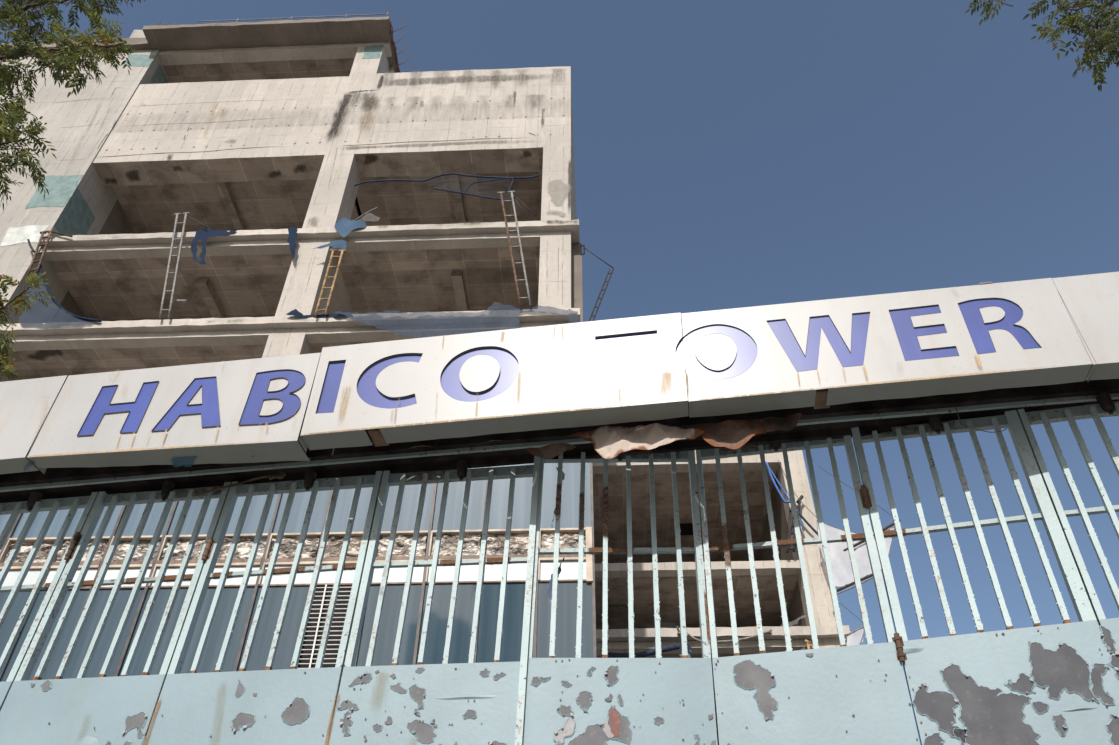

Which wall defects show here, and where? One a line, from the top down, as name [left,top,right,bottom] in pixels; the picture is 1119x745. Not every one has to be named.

damp [329,75,529,139]
peeling [281,696,310,725]
peeling [337,667,482,745]
peeling [530,660,635,745]
peeling [733,659,790,721]
peeling [909,625,1119,745]